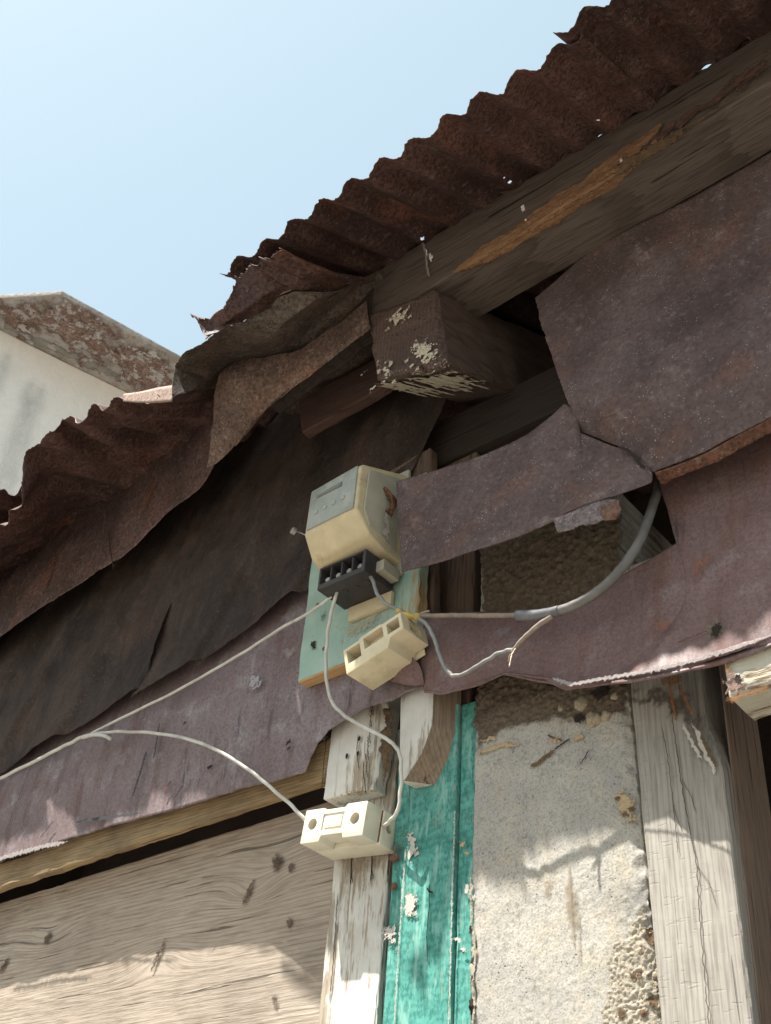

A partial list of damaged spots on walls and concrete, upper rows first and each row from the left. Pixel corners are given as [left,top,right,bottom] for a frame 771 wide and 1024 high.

peeling [385,305,412,332]
peeling [370,337,488,398]
spalling [472,635,771,755]
crack [661,700,716,1024]
peeling [382,830,419,1023]